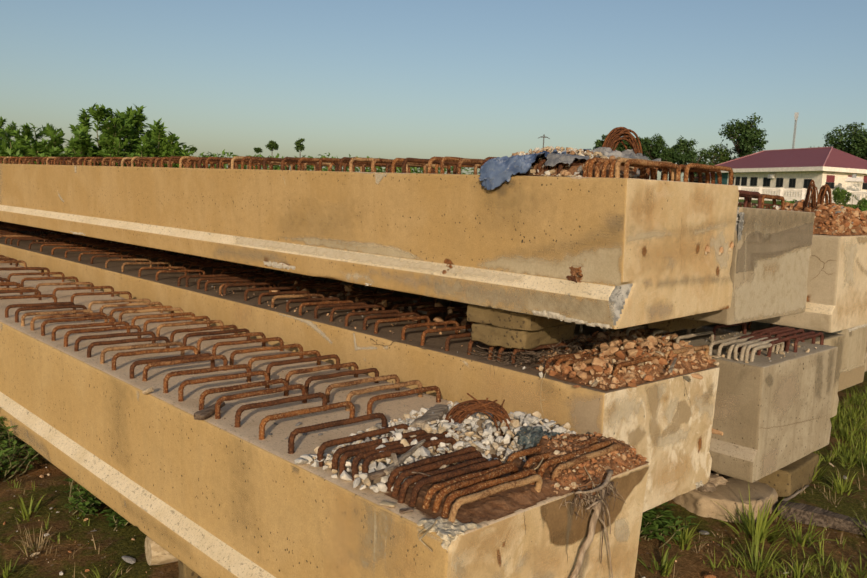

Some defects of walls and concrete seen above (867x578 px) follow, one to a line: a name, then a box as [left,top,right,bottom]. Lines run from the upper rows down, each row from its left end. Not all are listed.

corrosion [566,263,583,283]
spalling [532,283,633,329]
spalling [419,517,482,551]